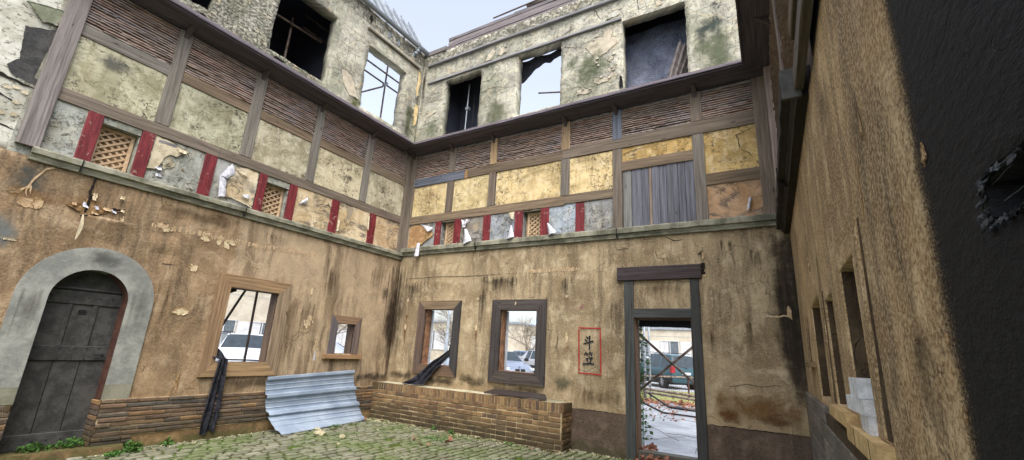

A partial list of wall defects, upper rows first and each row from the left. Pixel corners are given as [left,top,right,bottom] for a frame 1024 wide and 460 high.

water stain [368,0,622,86]
spalling [66,193,126,221]
flaking render [200,235,236,250]
flaking render [170,307,190,316]
water stain [384,268,414,348]